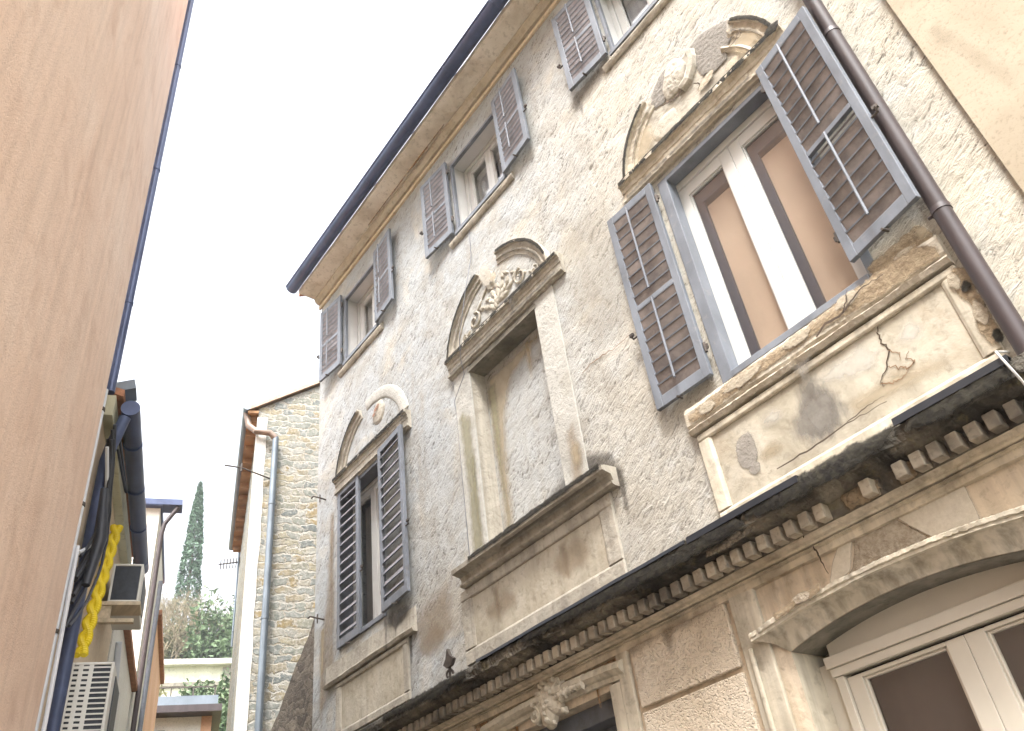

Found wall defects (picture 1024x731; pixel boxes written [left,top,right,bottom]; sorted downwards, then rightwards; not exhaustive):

leakage [796,364,838,439]
crack [777,327,915,469]